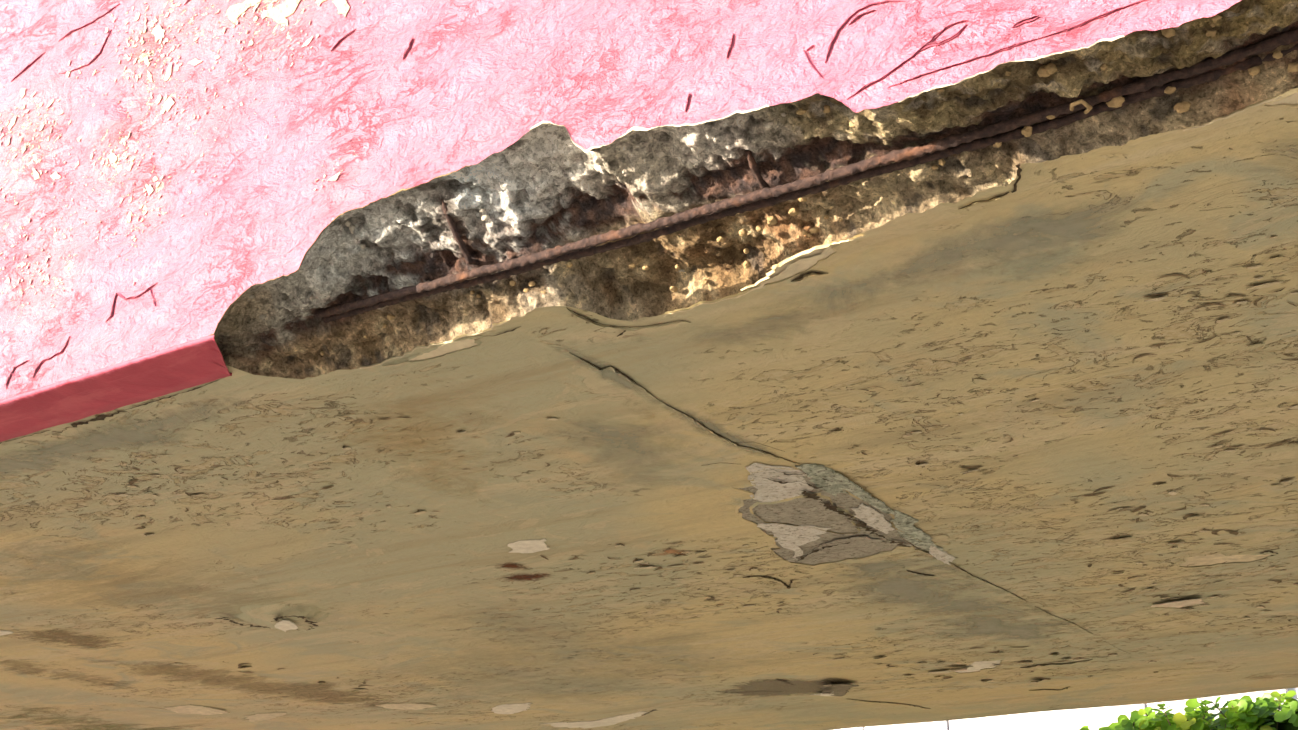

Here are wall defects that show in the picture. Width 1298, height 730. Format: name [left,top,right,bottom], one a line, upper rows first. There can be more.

spalling [209,0,1298,379]
crack [566,307,799,466]
peeling [1207,429,1243,452]
peeling [1256,428,1298,449]
peeling [507,538,625,574]
crack [743,576,798,588]
peeling [633,462,955,588]
crack [901,539,1128,691]
peeling [1103,467,1298,626]